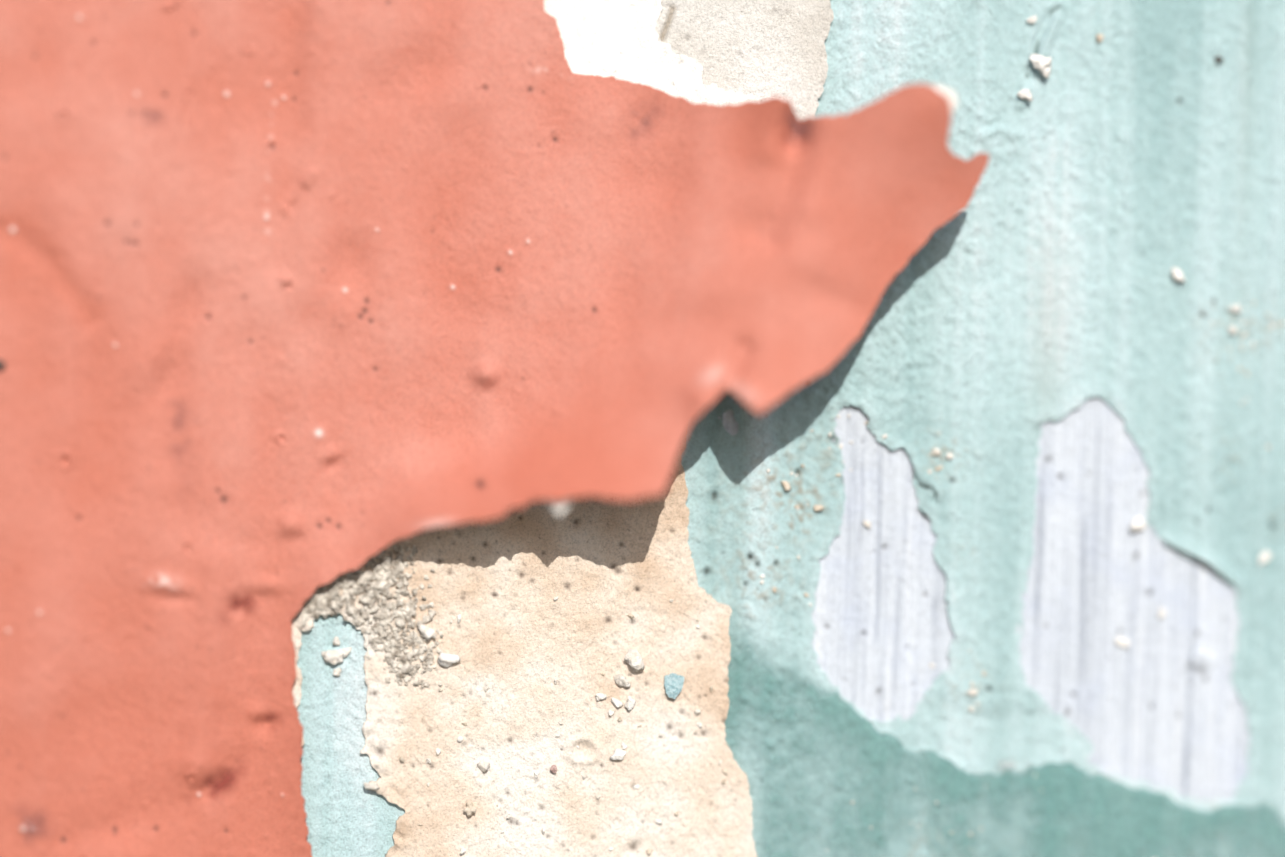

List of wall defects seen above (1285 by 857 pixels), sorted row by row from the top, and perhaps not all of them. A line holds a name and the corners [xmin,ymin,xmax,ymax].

peeling [284,0,990,857]
peeling [1016,396,1251,805]